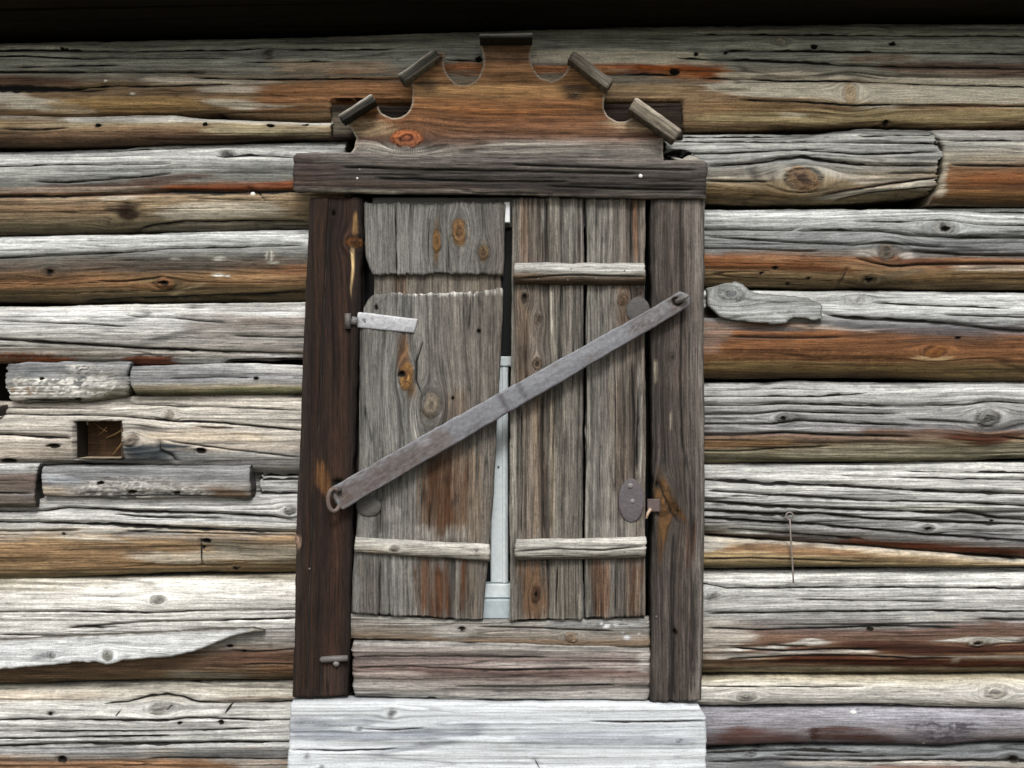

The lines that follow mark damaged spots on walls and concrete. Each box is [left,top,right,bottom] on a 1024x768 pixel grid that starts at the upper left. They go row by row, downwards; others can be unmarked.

crack [233,649,293,665]
crack [344,134,1024,723]